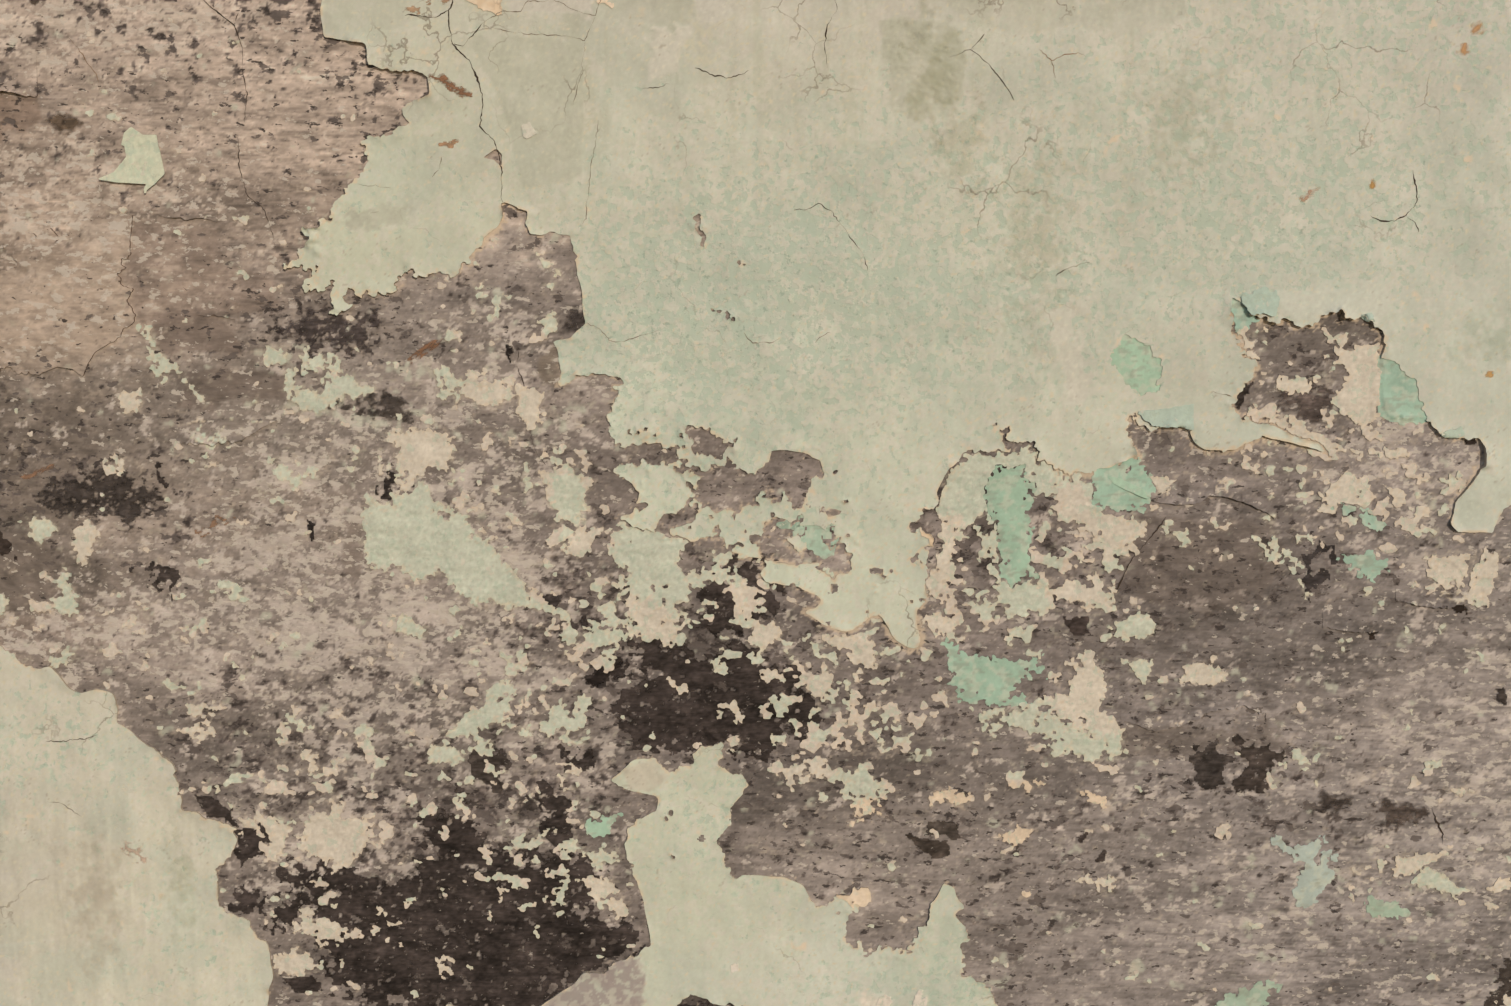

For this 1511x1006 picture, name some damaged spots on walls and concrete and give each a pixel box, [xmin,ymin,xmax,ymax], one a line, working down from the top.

crack [954,35,1014,100]
crack [405,0,601,228]
crack [1370,174,1419,231]
peeling [940,637,1045,707]
peeling [1200,287,1511,1006]
peeling [716,688,750,725]
peeling [438,825,450,841]
peeling [309,866,342,905]
peeling [460,864,531,903]
peeling [544,863,583,917]
peeling [948,787,1298,1006]
peeling [387,918,504,1006]